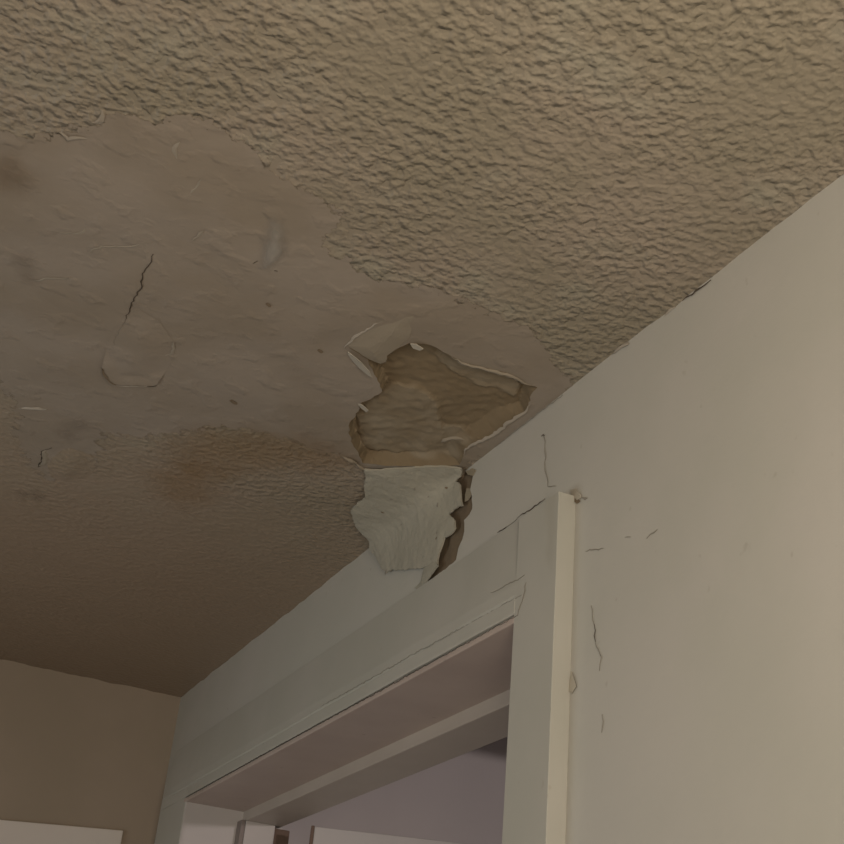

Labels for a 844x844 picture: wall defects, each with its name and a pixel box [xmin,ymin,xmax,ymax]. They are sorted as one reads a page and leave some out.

crack [112,256,152,352]
peeling [0,110,575,589]
crack [665,280,711,316]
crack [495,396,562,533]
crack [591,606,602,671]